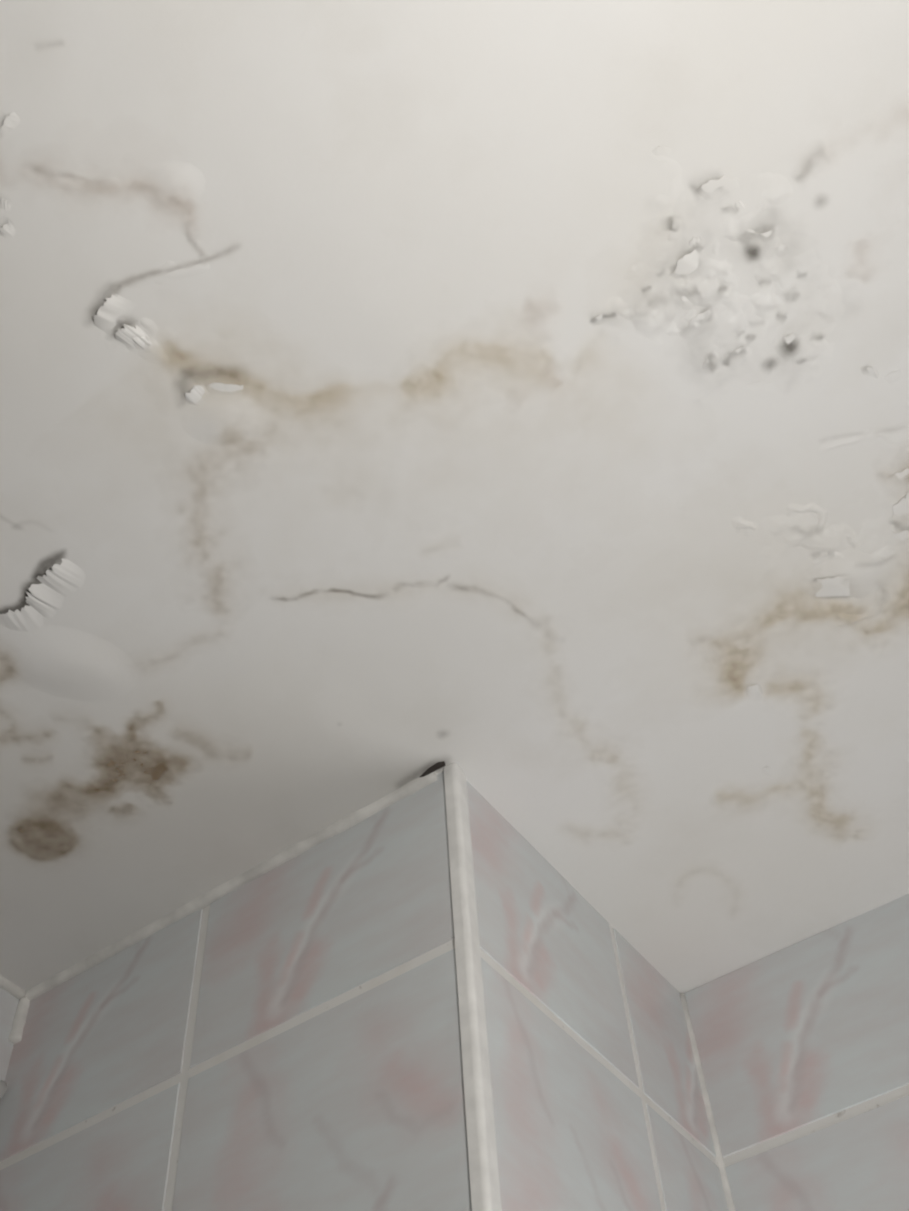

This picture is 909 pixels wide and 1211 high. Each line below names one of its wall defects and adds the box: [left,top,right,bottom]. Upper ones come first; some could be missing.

crack [127,258,210,289]
peeling [0,555,85,632]
damp [93,726,168,792]